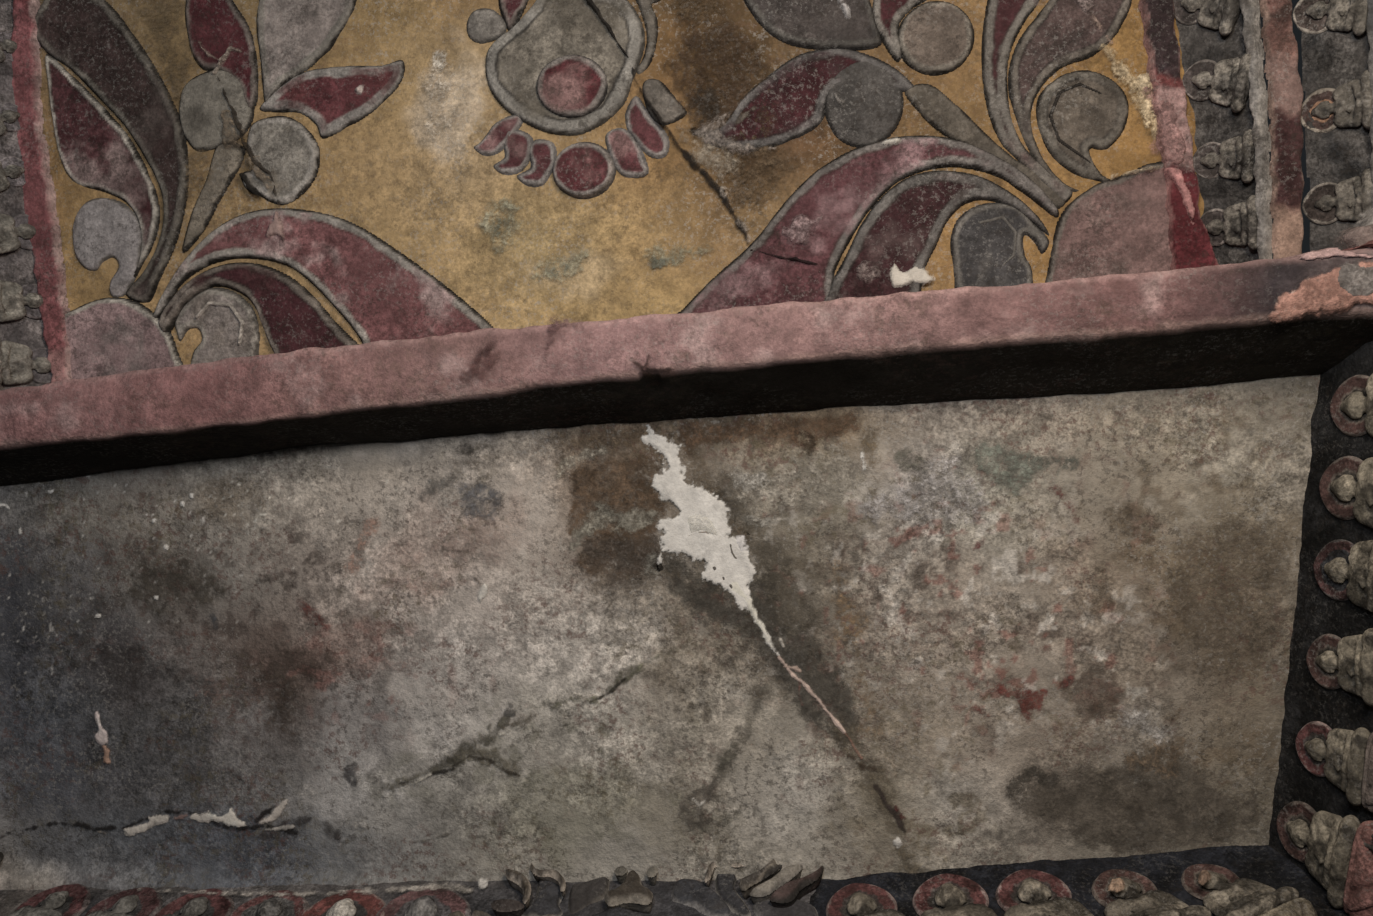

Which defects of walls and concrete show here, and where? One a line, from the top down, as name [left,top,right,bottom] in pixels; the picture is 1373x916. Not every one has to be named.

crack [586,0,818,265]
peeling [782,215,823,244]
peeling [856,260,935,288]
peeling [1269,190,1373,322]
peeling [641,425,779,656]
damp [555,427,919,873]
peeling [95,711,111,764]
crack [385,648,679,790]
crack [778,638,906,848]
crack [3,805,340,841]
peeling [124,799,295,836]